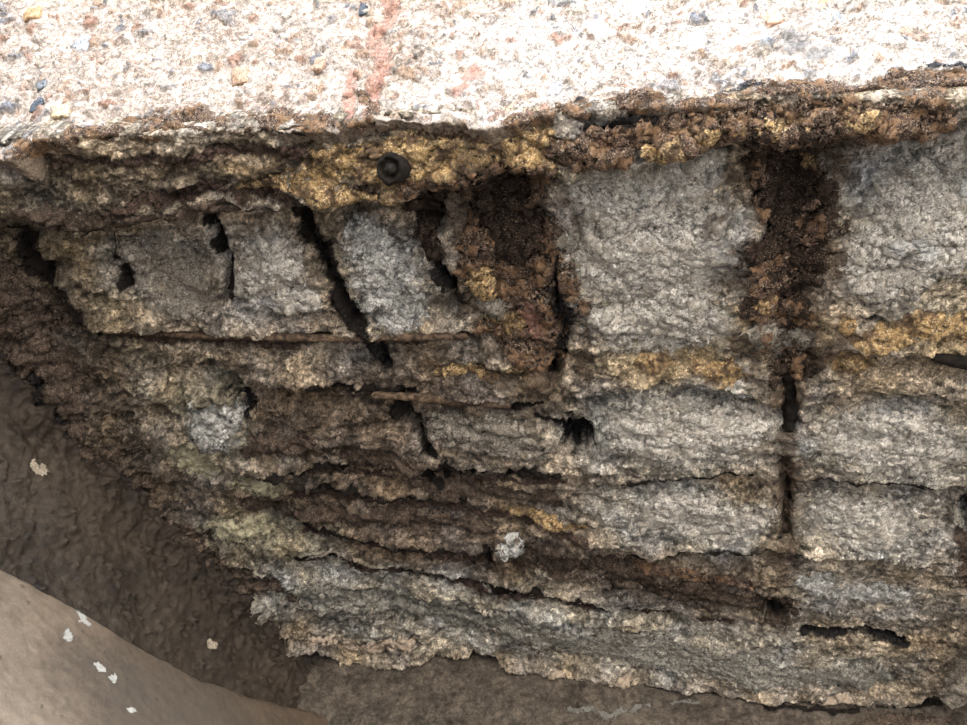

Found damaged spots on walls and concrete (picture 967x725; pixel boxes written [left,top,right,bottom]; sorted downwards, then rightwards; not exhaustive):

spalling [339,207,441,338]
corrosion [4,0,967,417]
spalling [559,145,738,359]
spalling [837,123,967,310]
corrosion [282,489,375,502]
corrosion [341,558,602,611]
corrosion [469,472,568,486]
corrosion [388,498,799,625]
spalling [591,393,784,471]
corrosion [767,424,803,588]
spalling [805,489,936,556]
spalling [812,402,967,485]